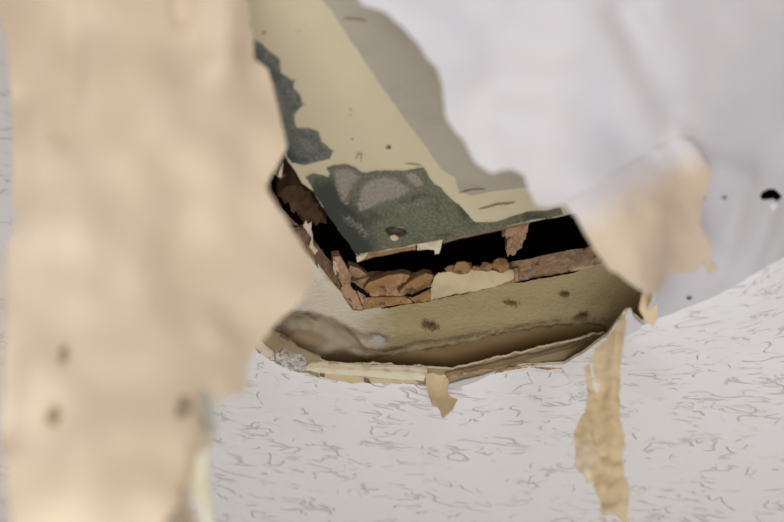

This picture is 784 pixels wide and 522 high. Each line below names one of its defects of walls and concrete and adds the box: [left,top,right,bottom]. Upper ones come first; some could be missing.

peeling [269,0,784,327]
peeling [321,309,630,522]